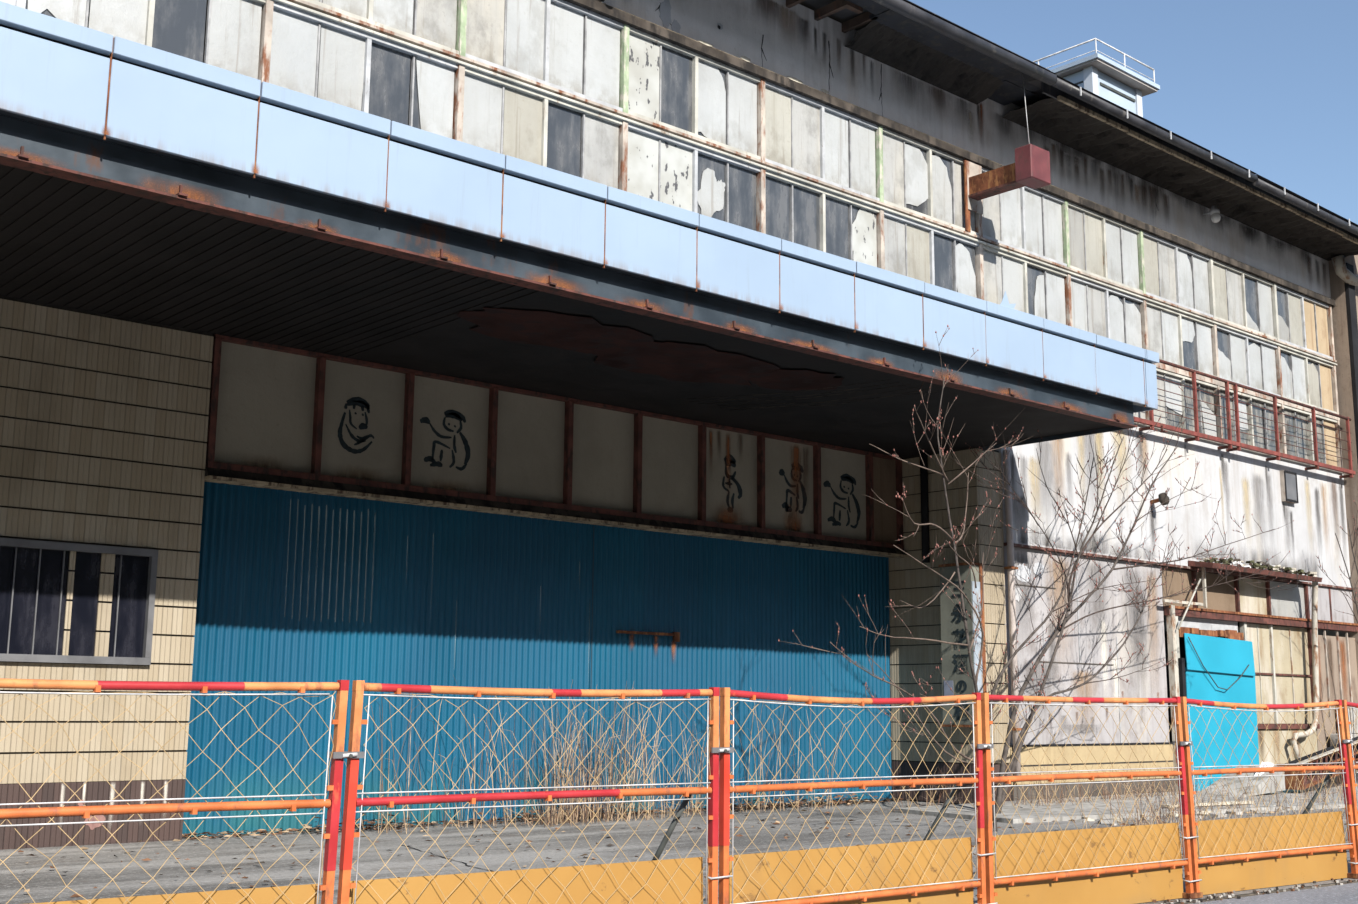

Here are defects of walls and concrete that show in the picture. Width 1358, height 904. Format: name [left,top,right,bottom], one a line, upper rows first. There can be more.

rust [170,188,204,201]
rust [537,278,573,290]
damp [1010,430,1125,483]
damp [1018,535,1155,620]
damp [1102,623,1117,685]